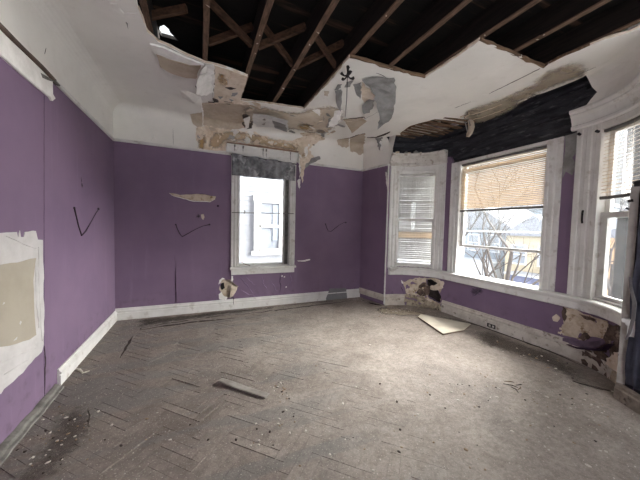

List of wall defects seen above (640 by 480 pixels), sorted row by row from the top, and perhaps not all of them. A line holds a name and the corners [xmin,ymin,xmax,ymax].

flaking render [150,43,219,103]
flaking render [195,114,321,152]
peeling [324,73,396,130]
flaking render [388,76,597,163]
flaking render [169,193,219,207]
flaking render [219,276,238,304]
flaking render [401,277,444,304]
peeling [563,338,615,351]